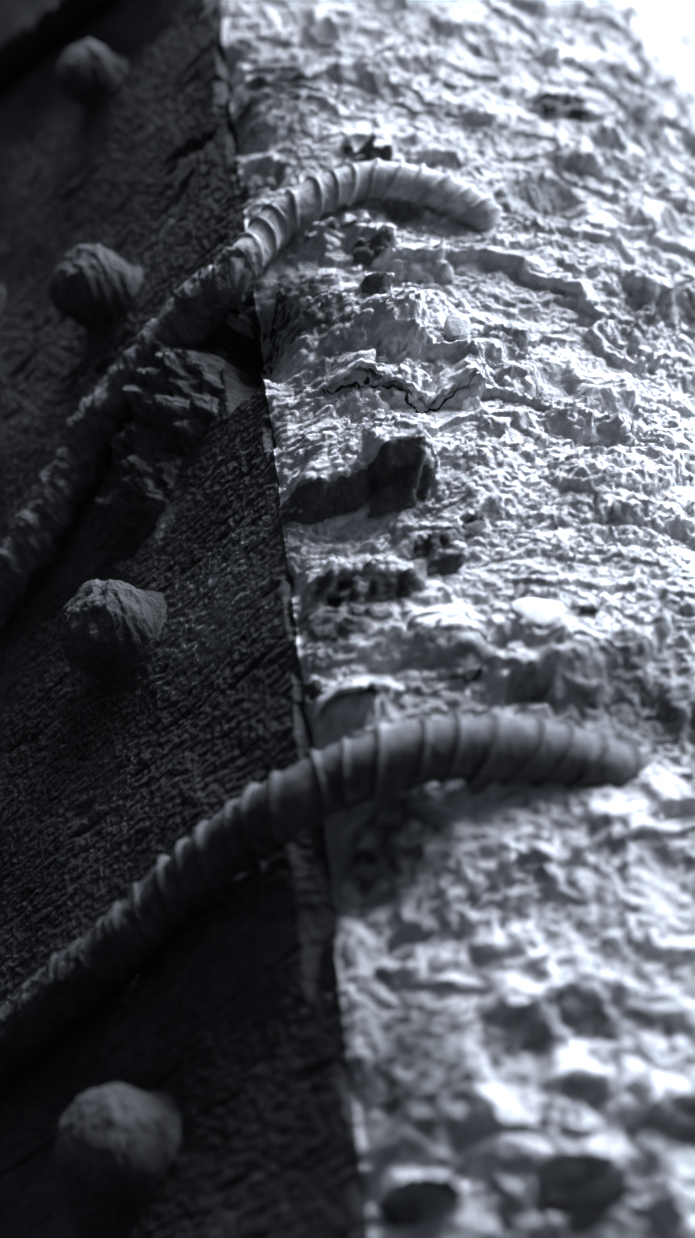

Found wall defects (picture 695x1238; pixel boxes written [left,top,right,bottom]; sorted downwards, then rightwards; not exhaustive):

crack [306,369,480,424]